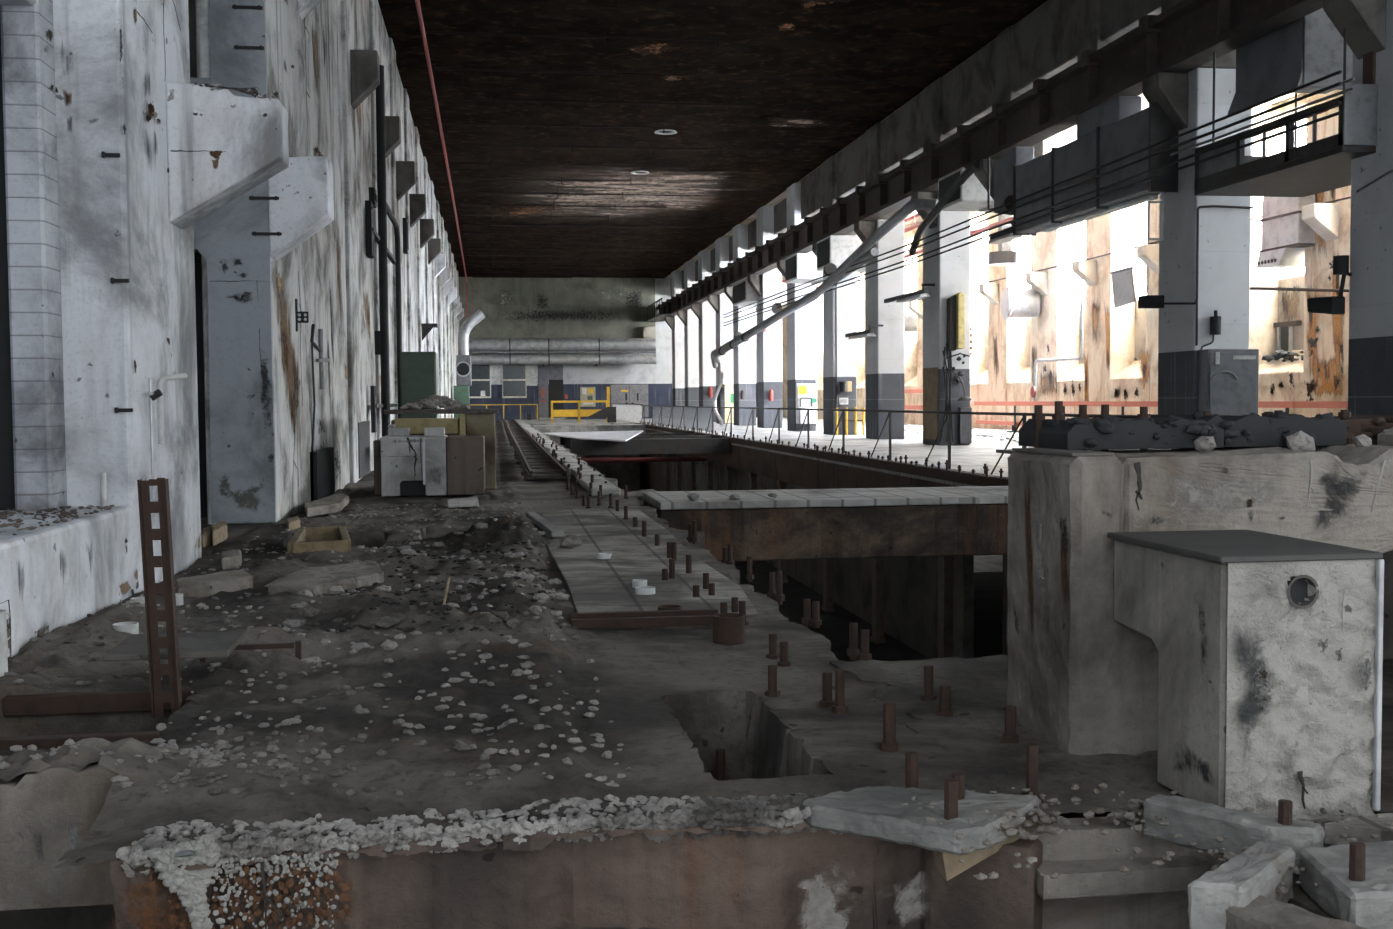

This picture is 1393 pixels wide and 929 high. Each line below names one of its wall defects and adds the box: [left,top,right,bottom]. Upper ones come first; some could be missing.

corrosion [276,273,300,433]
corrosion [1307,295,1343,396]
water stain [1236,634,1269,749]